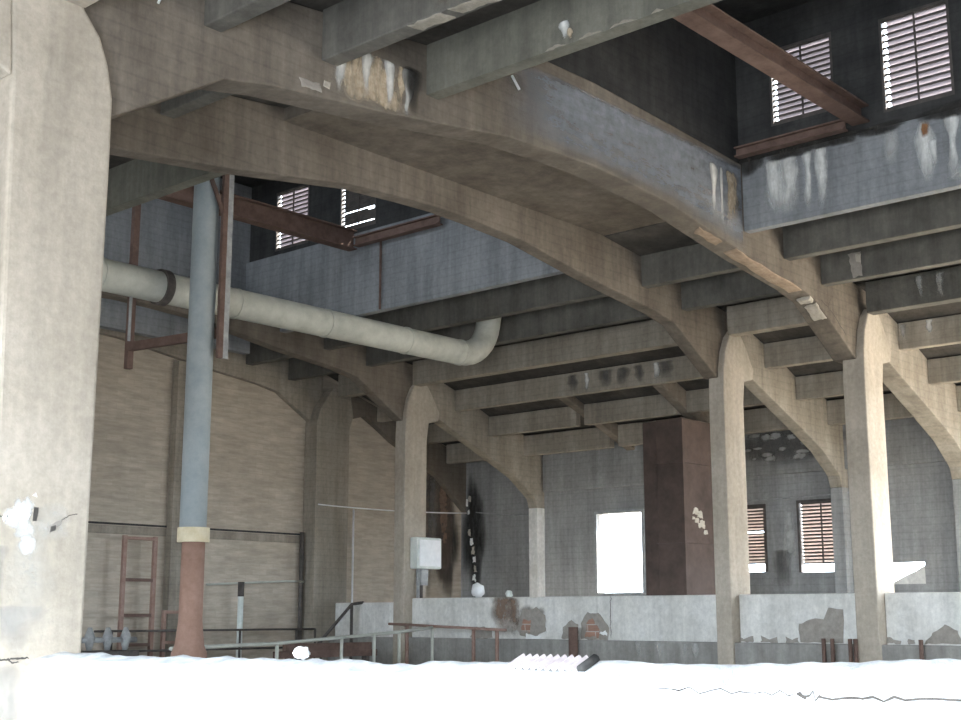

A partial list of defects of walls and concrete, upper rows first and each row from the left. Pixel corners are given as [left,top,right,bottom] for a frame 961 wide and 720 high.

water stain [917,123,936,171]
water stain [947,115,958,164]
water stain [768,148,826,200]
peeling [2,493,39,553]
peeling [518,607,546,639]
peeling [561,612,609,640]
peeling [740,608,844,643]
peeling [887,625,961,645]